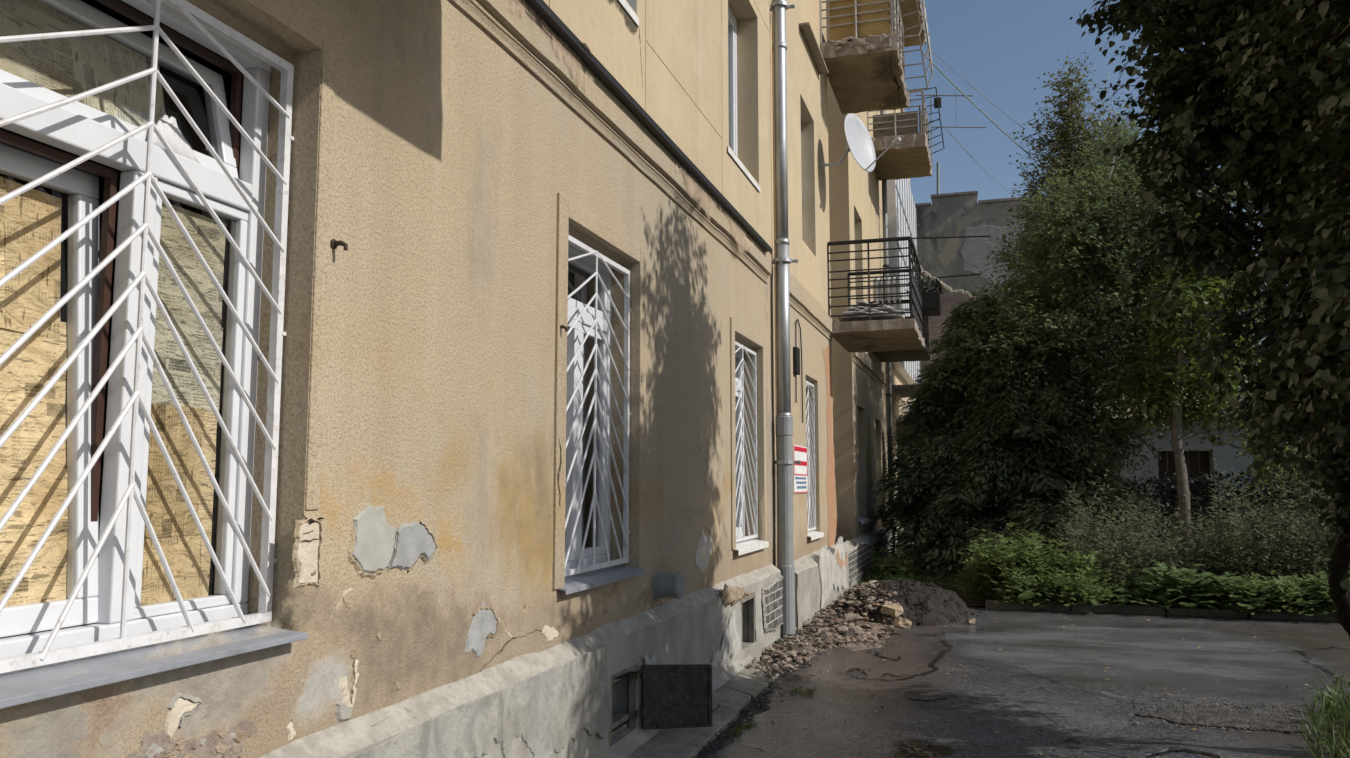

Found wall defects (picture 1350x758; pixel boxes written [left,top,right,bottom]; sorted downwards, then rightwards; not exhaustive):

flaking render [292,514,324,589]
peeling [75,687,133,758]
flaking render [126,692,259,758]